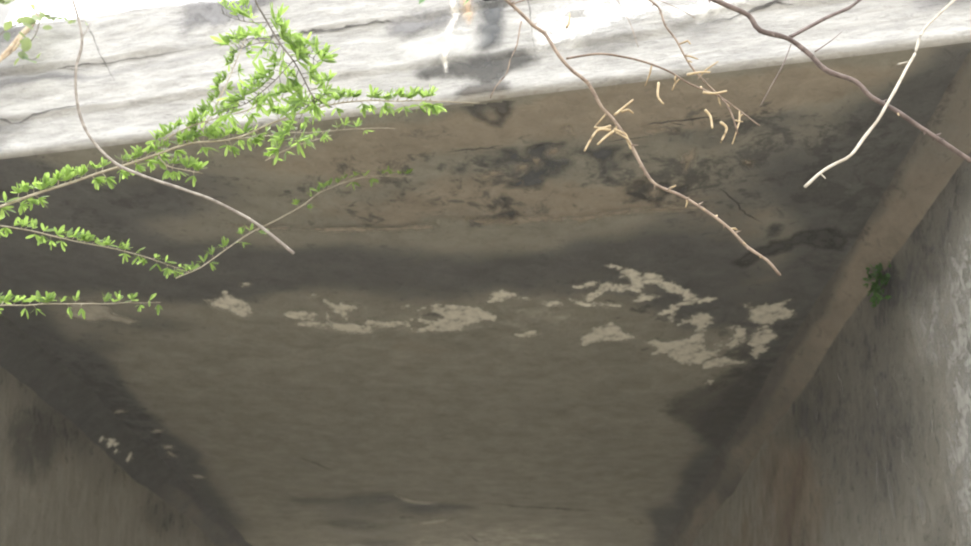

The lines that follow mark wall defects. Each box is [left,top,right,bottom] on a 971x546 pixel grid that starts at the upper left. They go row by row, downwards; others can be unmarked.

crack [32,20,395,76]
leakage [412,0,745,125]
crack [0,102,95,124]
leakage [483,143,569,219]
leakage [583,147,631,179]
peeling [208,290,253,317]
peeling [281,290,529,334]
peeling [545,264,794,384]